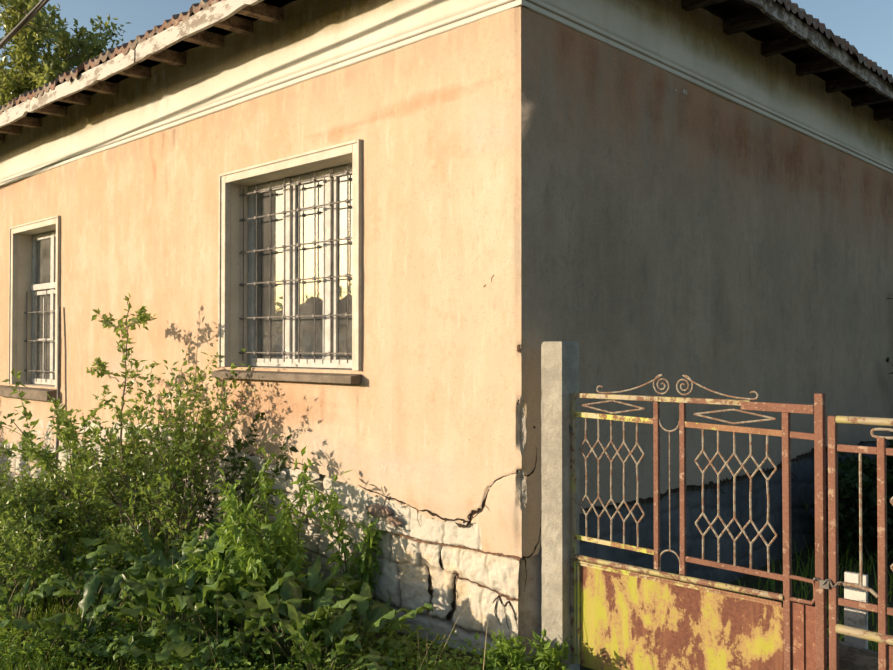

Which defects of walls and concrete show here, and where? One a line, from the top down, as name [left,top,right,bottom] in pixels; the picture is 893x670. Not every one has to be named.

spalling [365,504,402,527]
crack [358,452,542,630]